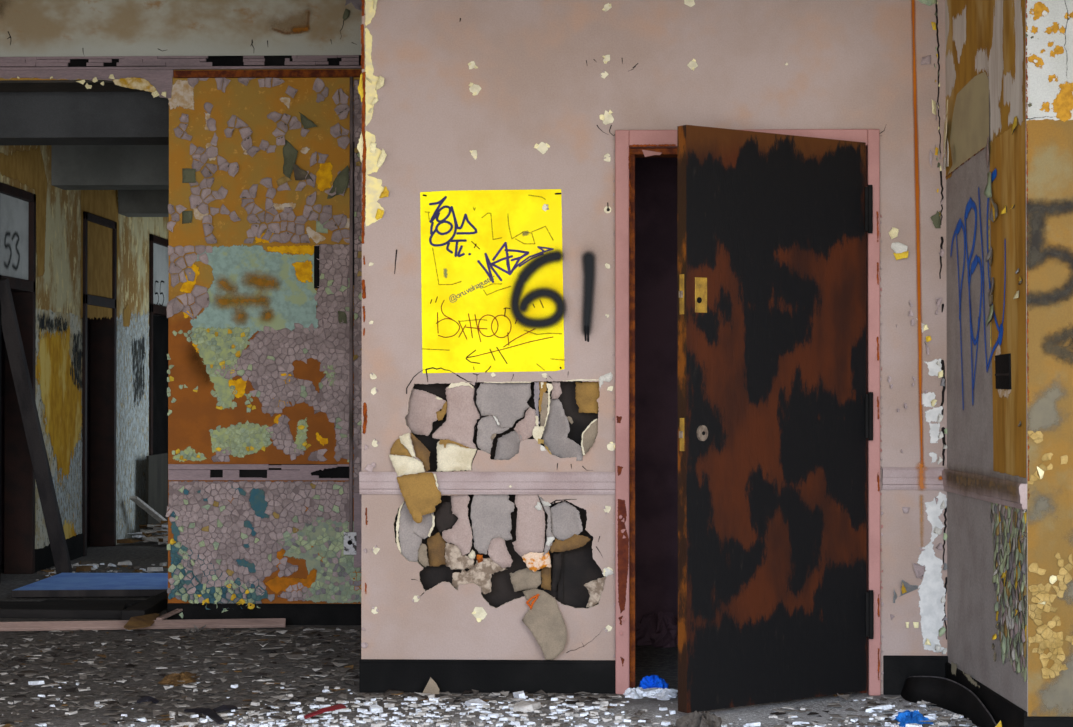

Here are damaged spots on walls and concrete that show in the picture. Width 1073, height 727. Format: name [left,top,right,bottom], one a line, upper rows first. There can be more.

peeling [36,0,389,618]
peeling [472,607,487,622]
peeling [599,345,615,392]
peeling [607,442,623,476]
peeling [880,215,980,690]
crack [935,0,944,312]
peeling [918,0,1073,485]
peeling [990,496,1073,717]